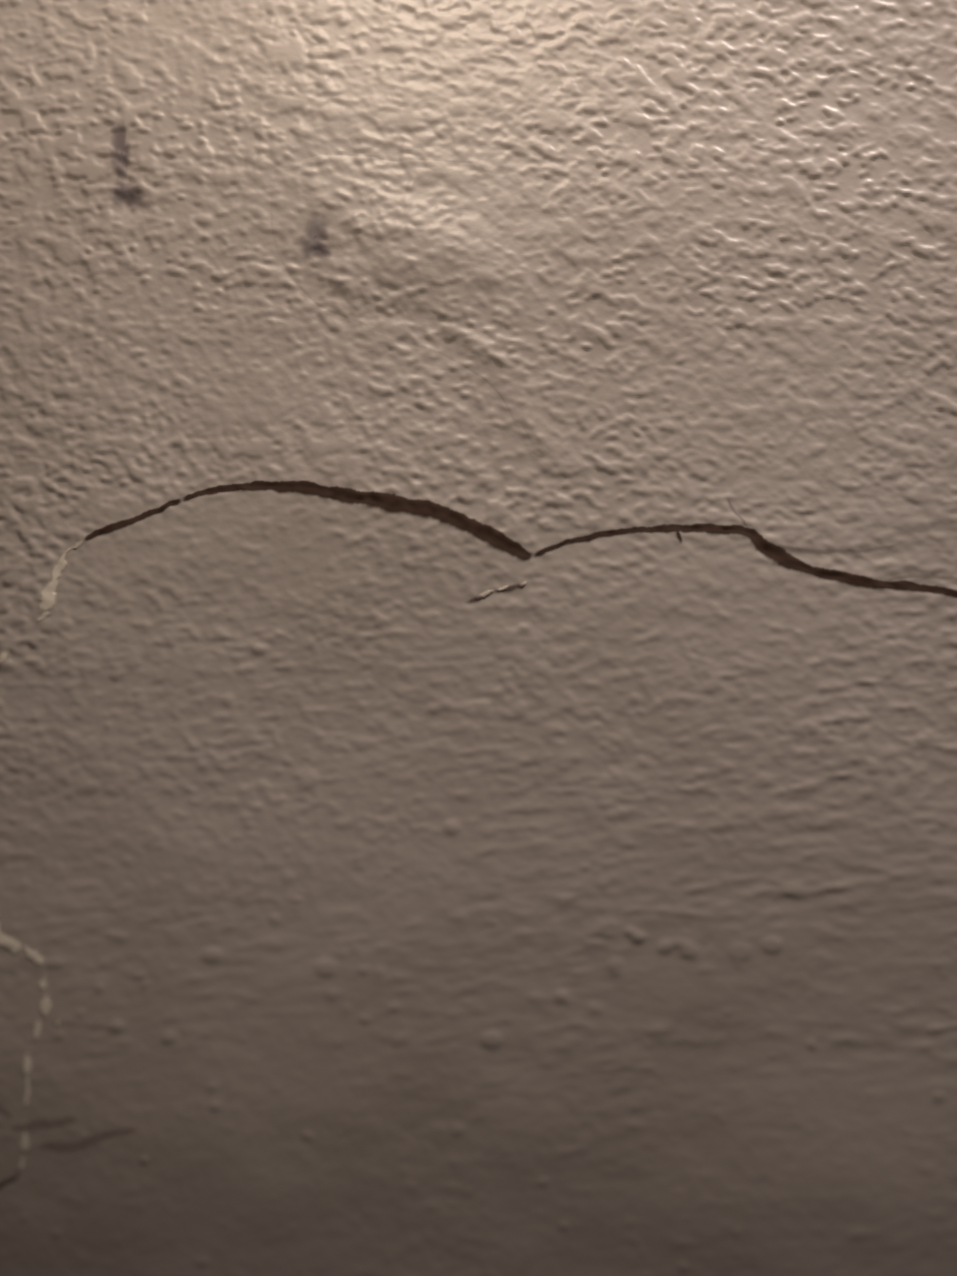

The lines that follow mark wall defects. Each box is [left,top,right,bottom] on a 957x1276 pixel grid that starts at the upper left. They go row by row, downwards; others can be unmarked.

crack [38,480,957,621]
crack [0,652,8,663]
crack [0,931,60,1187]